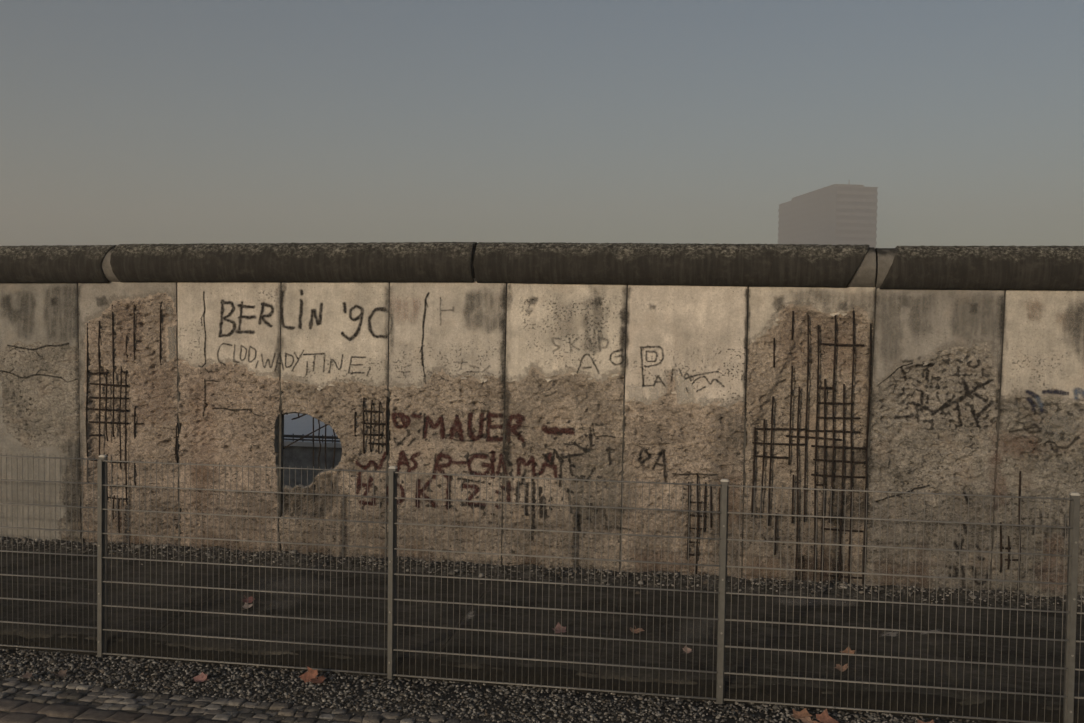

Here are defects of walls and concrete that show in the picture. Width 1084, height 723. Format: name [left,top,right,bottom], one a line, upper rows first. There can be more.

crack [0,343,77,382]
spalling [0,292,1084,597]